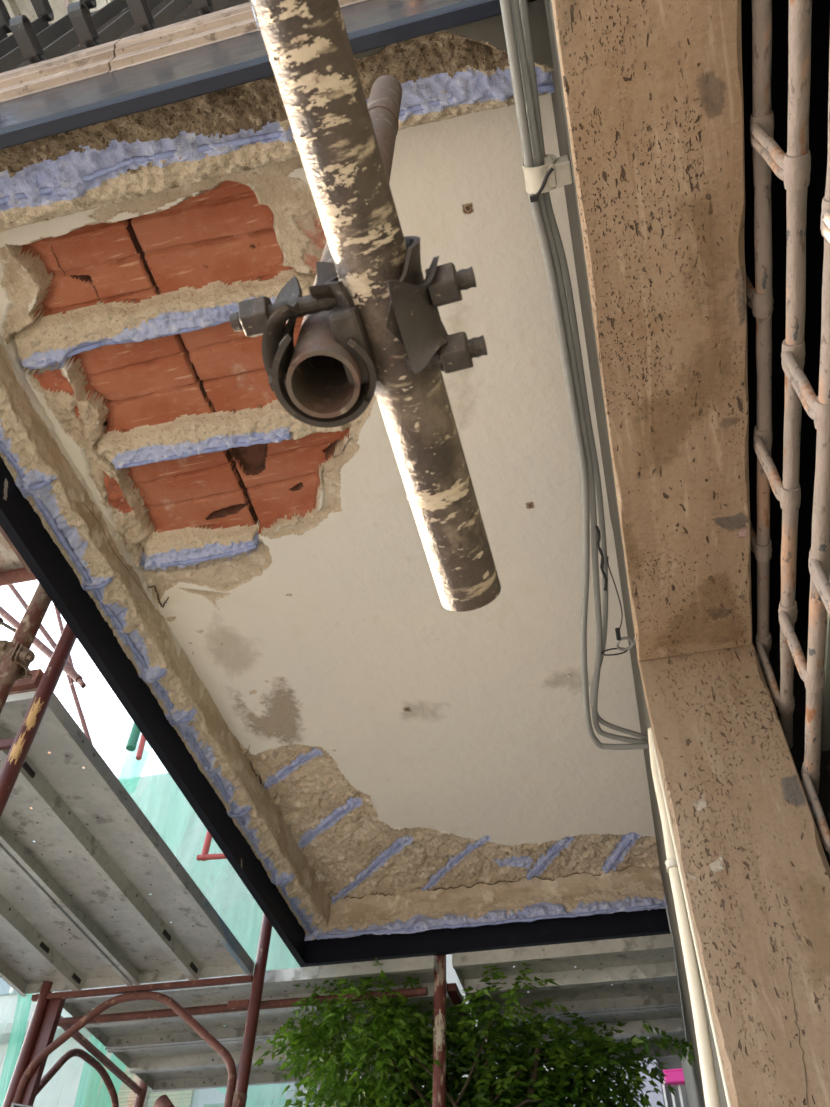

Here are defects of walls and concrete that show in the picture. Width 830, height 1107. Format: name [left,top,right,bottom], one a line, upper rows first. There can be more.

spalling [355,31,510,102]
spalling [398,96,515,131]
spalling [0,76,377,610]
spalling [0,380,536,940]
water stain [249,690,298,741]
spalling [238,741,665,912]